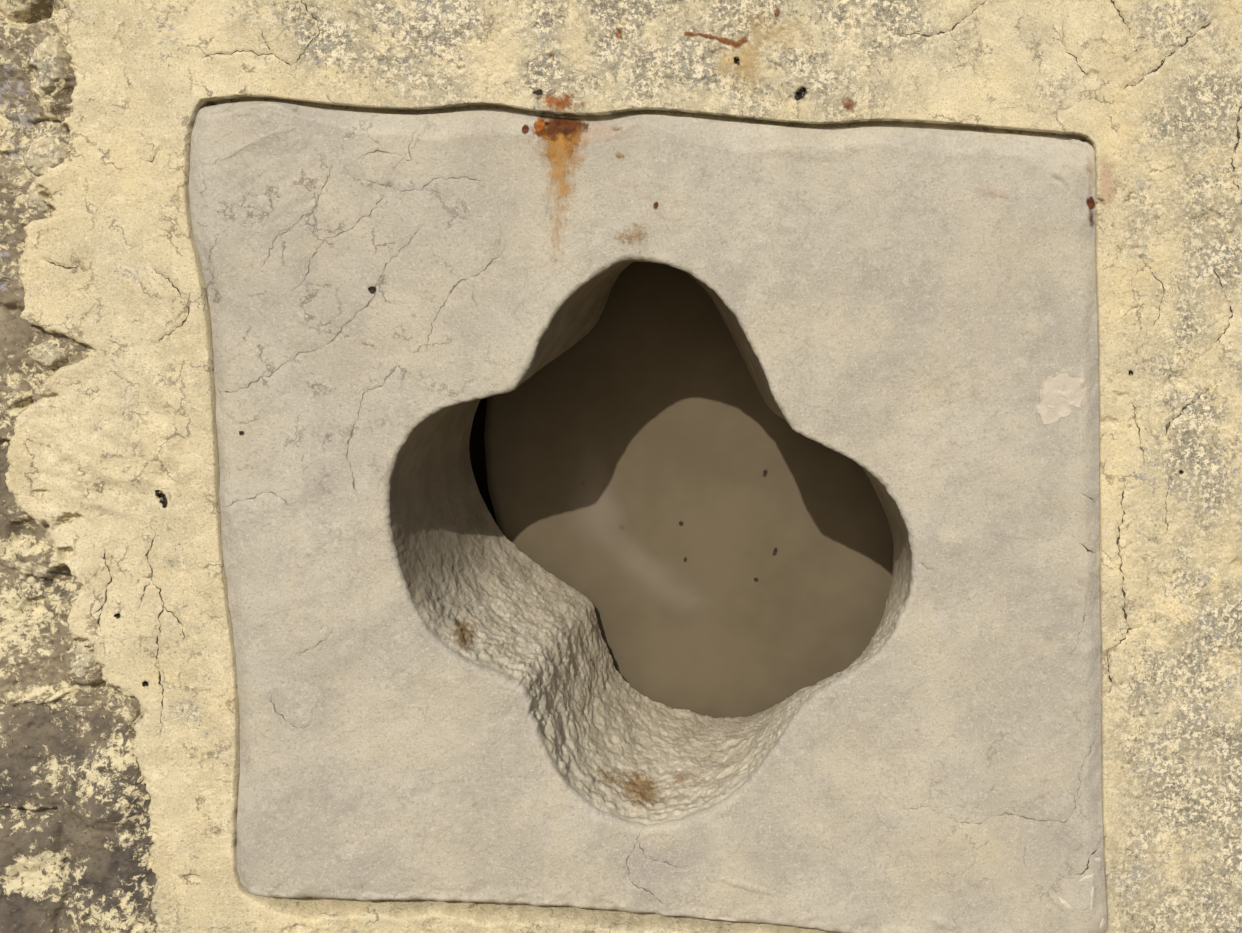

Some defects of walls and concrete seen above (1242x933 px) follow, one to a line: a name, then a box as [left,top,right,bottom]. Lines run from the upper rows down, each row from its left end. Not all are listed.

crack [1124,20,1213,90]
corrosion [522,94,583,196]
crack [1231,105,1242,205]
crack [261,132,480,287]
crack [220,230,418,393]
crack [426,251,503,352]
crack [1205,269,1233,353]
crack [346,369,394,496]
peeling [1035,368,1087,424]
crack [1133,392,1206,533]
crack [902,740,1095,825]
crack [626,831,682,903]